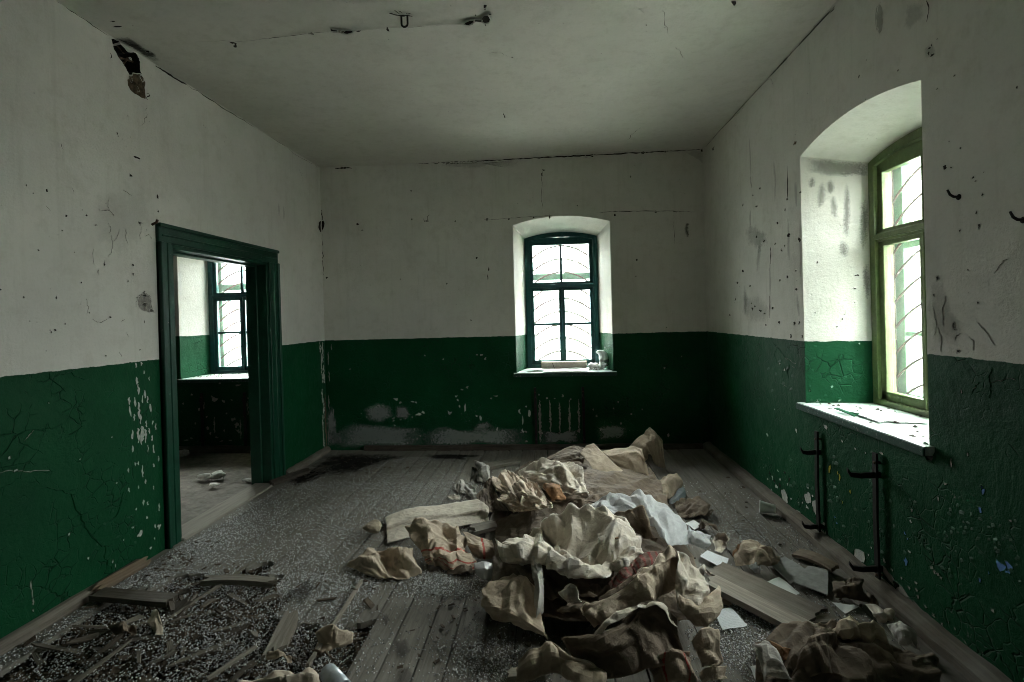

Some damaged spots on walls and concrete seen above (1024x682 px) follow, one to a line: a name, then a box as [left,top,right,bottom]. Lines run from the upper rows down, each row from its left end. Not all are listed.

spalling [110,20,151,125]
damp [810,161,864,231]
crack [38,369,89,391]
spalling [136,291,155,324]
peeling [319,342,643,446]
crack [932,296,1017,398]
peeling [115,348,162,550]
peeling [767,469,838,535]